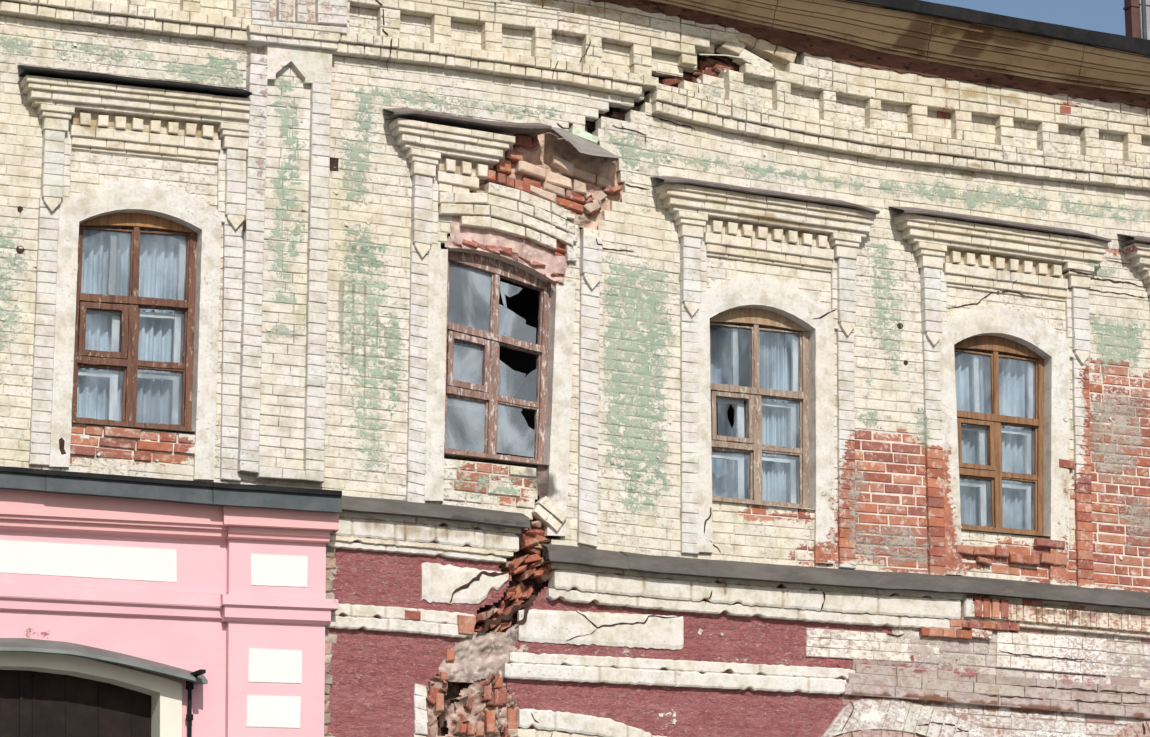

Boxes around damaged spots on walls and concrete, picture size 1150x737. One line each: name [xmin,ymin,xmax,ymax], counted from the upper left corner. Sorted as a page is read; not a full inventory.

spalling [330,77,1150,480]
crack [946,280,1032,308]
crack [1062,260,1150,298]
spalling [781,237,941,568]
spalling [59,424,195,470]
spalling [444,459,537,508]
crack [449,455,557,636]
spalling [956,459,1077,581]
peeling [1089,310,1150,593]
crack [566,610,672,641]
spalling [817,595,1043,679]
crack [437,681,468,736]